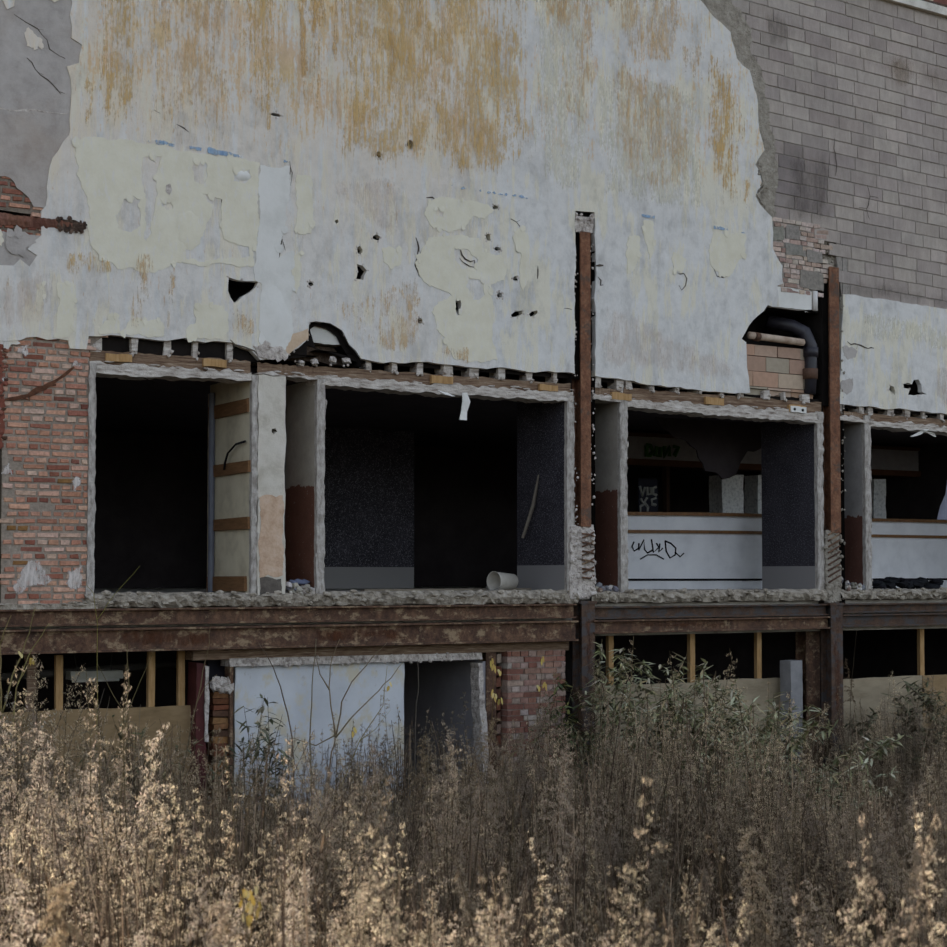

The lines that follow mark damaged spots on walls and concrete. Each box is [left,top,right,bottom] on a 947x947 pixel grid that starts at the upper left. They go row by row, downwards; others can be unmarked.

peeling [0,225,36,257]
peeling [24,27,44,50]
damp [86,0,139,122]
peeling [54,136,361,369]
peeling [415,197,519,363]
damp [299,0,701,205]
damp [685,48,750,202]
spalling [756,159,769,209]
flaking render [248,375,284,595]
spalling [314,379,327,594]